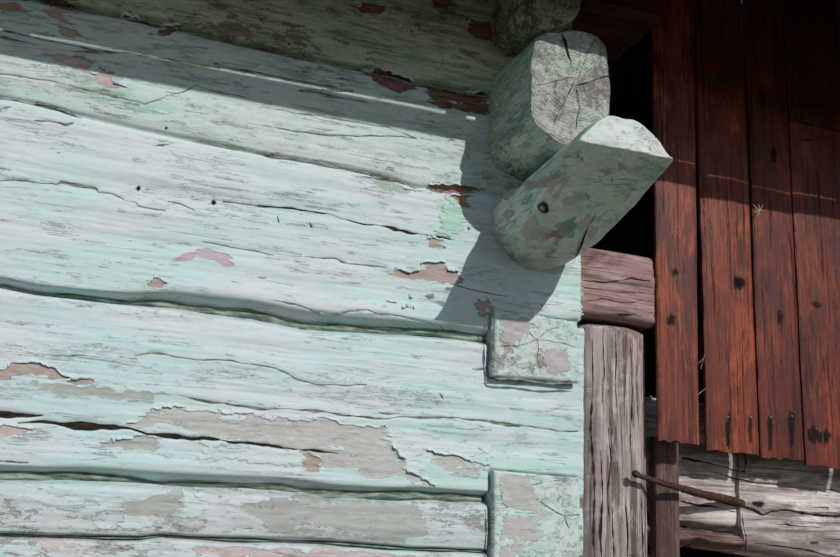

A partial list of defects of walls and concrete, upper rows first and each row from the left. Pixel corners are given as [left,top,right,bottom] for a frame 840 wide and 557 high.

crack [0,30,418,139]
peeling [362,66,489,115]
crack [538,31,610,128]
crack [0,168,194,211]
crack [202,141,471,193]
peeling [371,177,486,249]
peeling [388,259,464,284]
crack [0,411,338,454]
peeling [0,359,494,486]
peeling [95,487,208,529]
peeling [240,496,429,544]
crack [680,489,840,557]